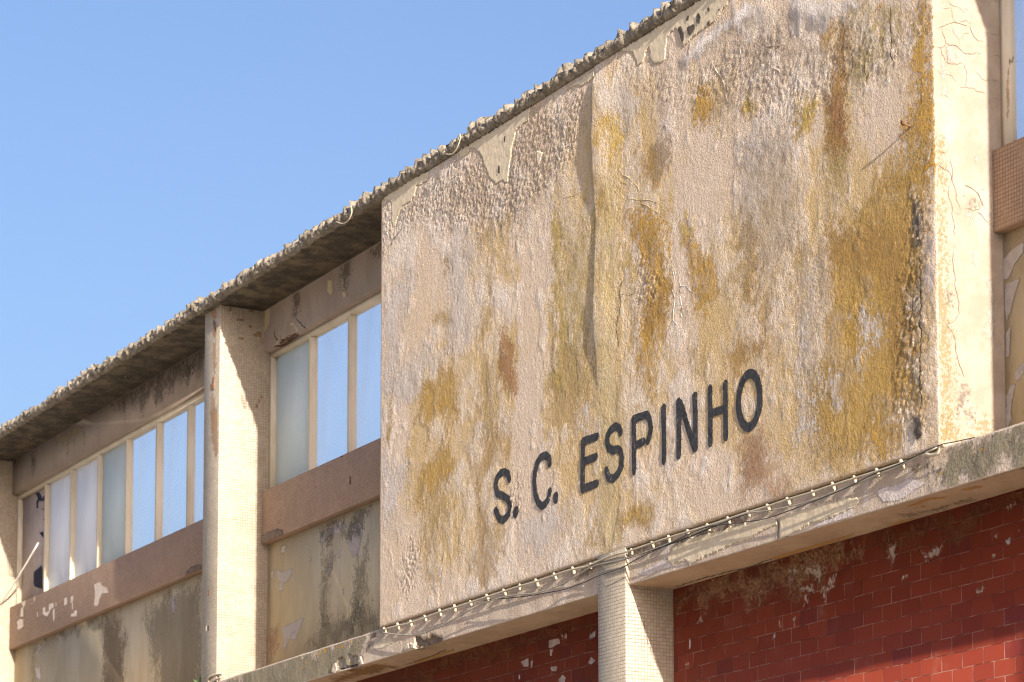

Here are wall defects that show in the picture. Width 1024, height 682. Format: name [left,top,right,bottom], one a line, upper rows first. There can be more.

crack [919,0,1000,112]
damp [741,89,770,169]
spalling [0,0,729,457]
damp [544,87,721,582]
damp [789,0,936,482]
crack [924,146,985,375]
peeling [983,242,1024,357]
peeling [877,478,945,526]
peeling [17,566,77,629]
peeling [94,582,108,606]
damp [101,615,128,682]
damp [675,542,862,621]